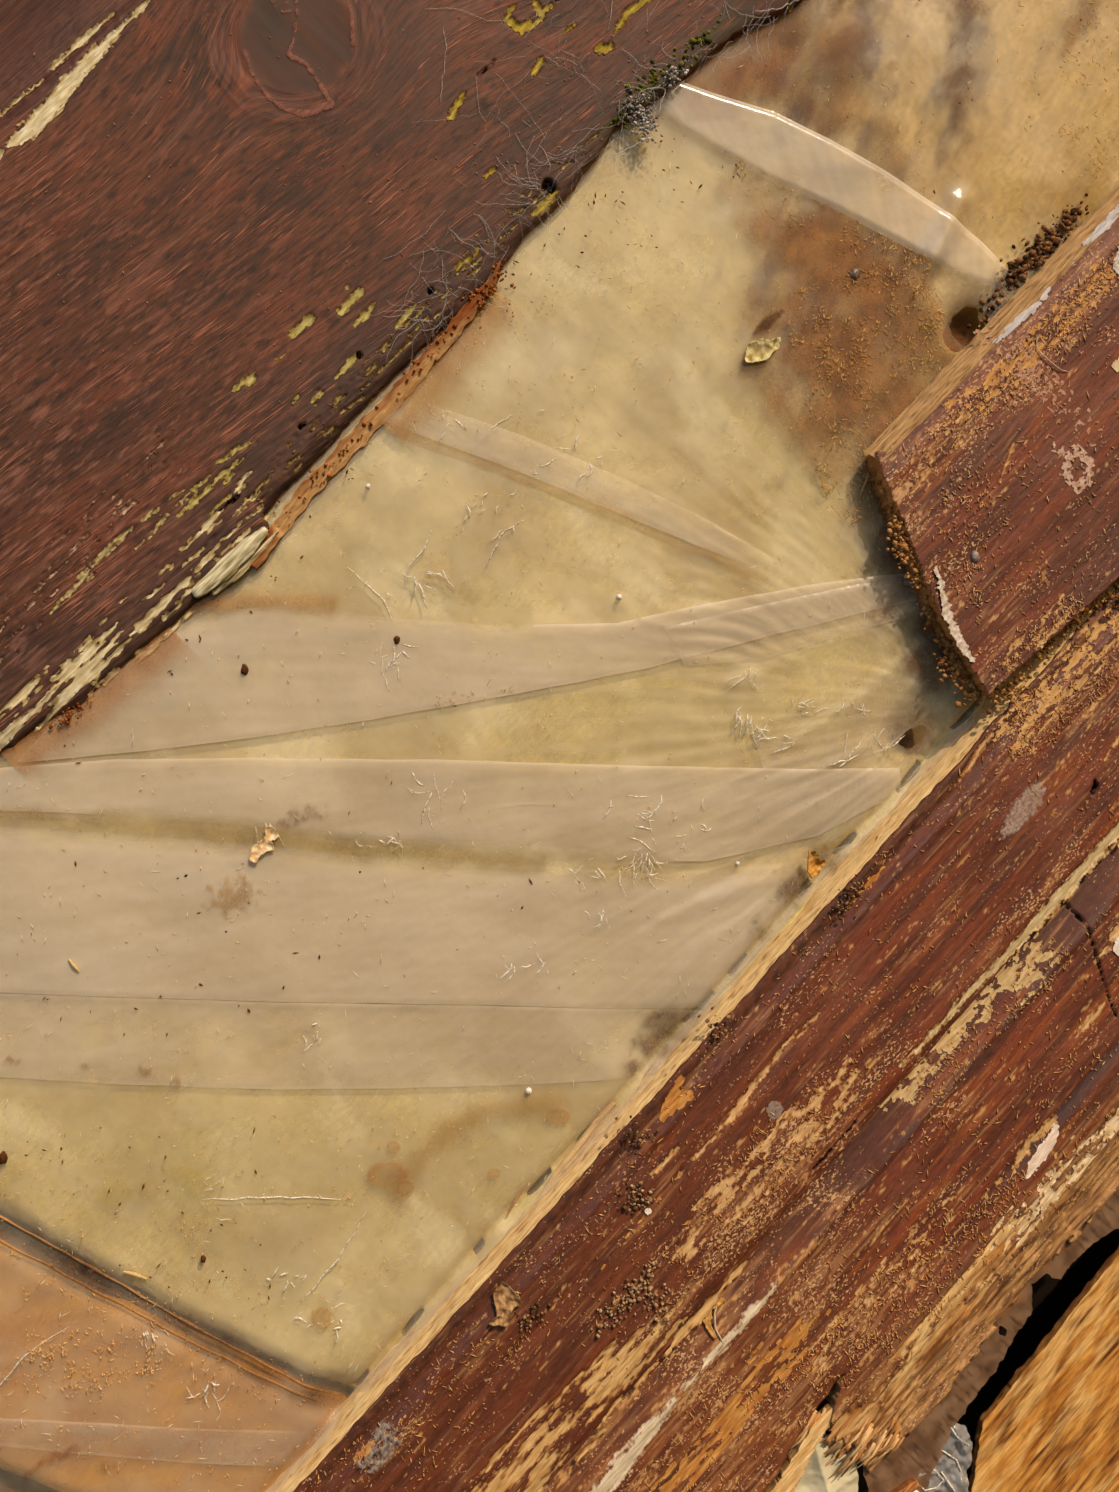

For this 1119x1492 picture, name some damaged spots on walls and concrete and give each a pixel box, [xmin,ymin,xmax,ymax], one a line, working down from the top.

peeling [0,0,150,160]
peeling [274,314,316,361]
peeling [291,187,560,437]
leakage [754,209,956,460]
peeling [898,204,1119,517]
peeling [0,442,302,767]
peeling [954,550,1119,787]
peeling [649,1012,821,1180]
peeling [879,822,1119,1112]
peeling [463,1055,861,1492]
peeling [650,1188,959,1492]
peeling [826,1108,1119,1461]